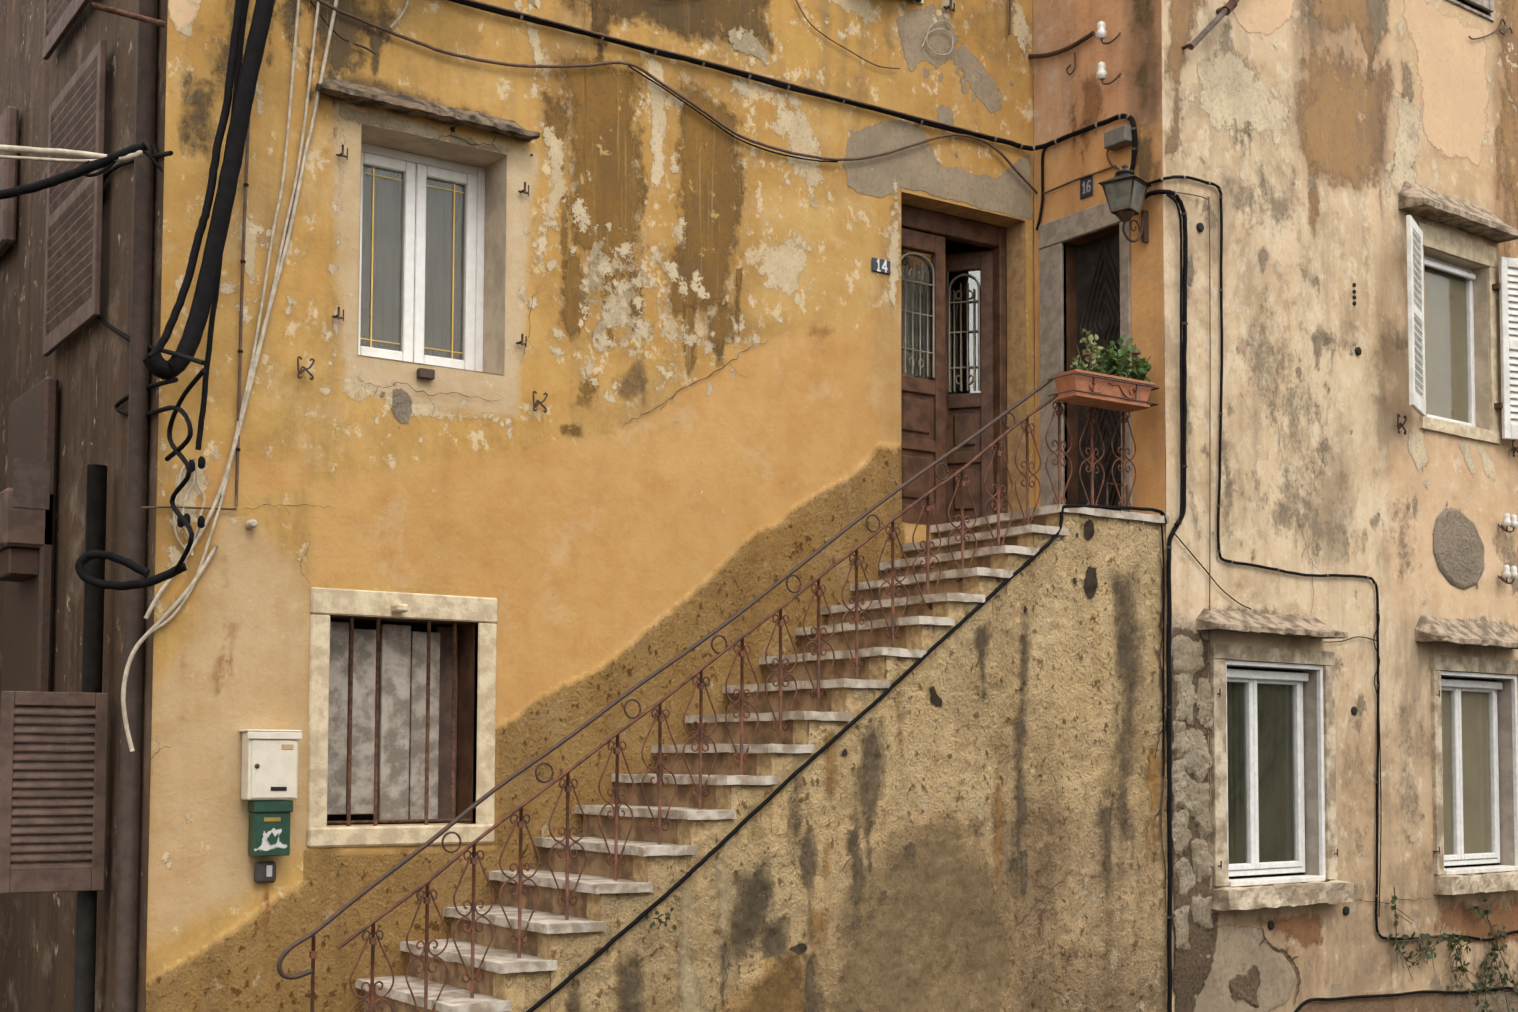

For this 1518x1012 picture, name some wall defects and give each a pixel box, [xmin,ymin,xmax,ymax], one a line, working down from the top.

peeling [337,103,760,403]
damp [542,0,774,376]
peeling [728,25,832,209]
peeling [755,219,812,323]
damp [1214,21,1259,82]
damp [1259,248,1268,272]
damp [1228,0,1415,234]
peeling [320,298,513,440]
damp [561,425,581,436]
damp [578,380,599,404]
spalling [1171,627,1296,1012]